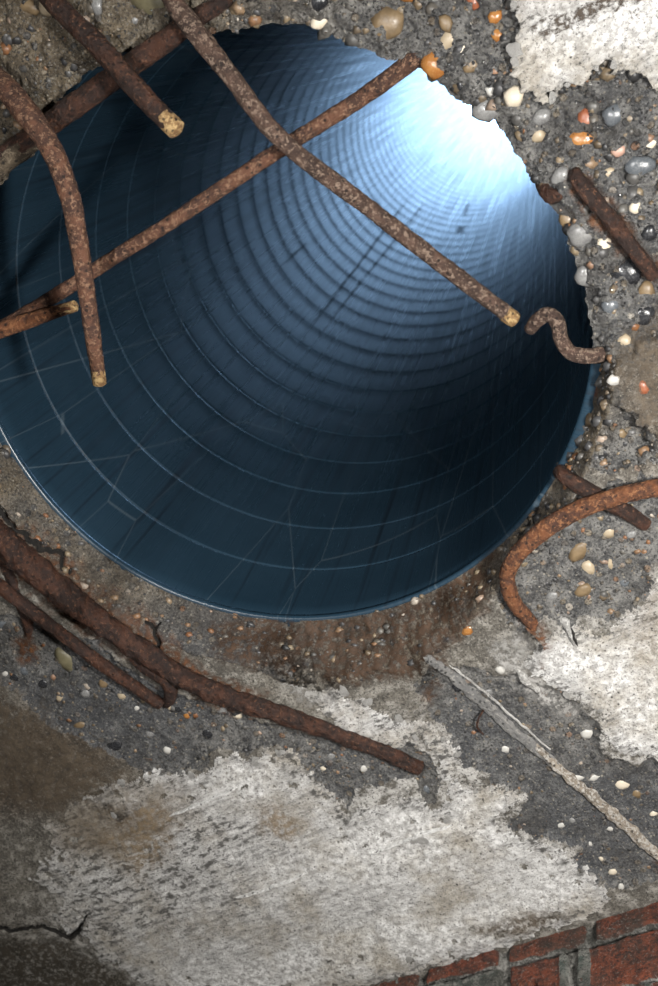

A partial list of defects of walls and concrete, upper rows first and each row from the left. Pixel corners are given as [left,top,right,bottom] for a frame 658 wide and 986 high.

spalling [0,0,658,498]
crack [0,914,88,940]
peeling [0,443,658,986]
corrosion [211,549,496,685]